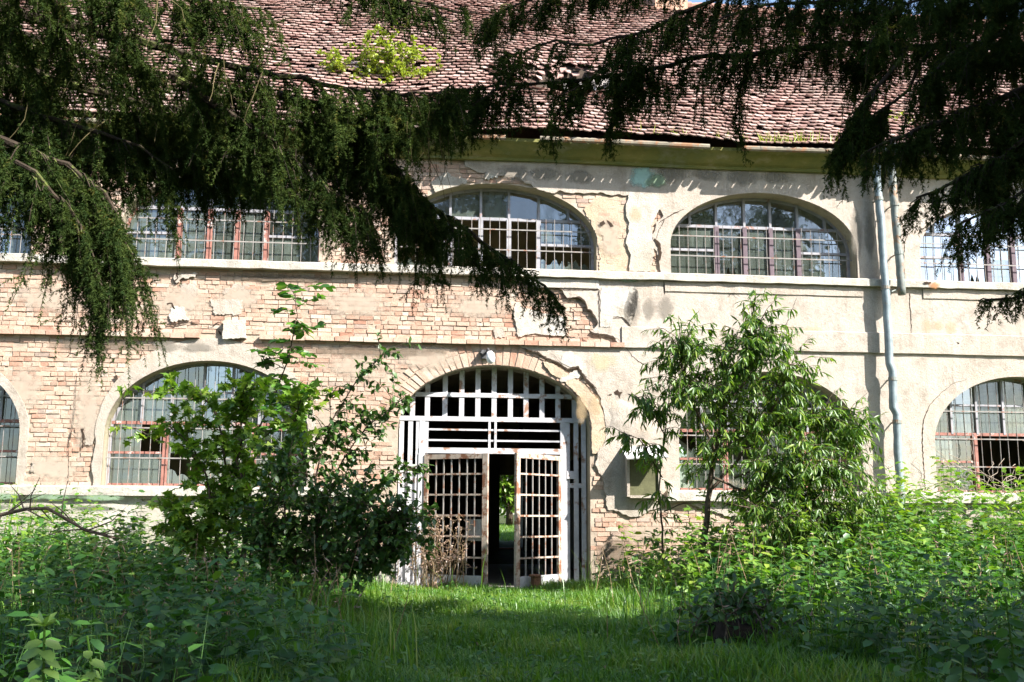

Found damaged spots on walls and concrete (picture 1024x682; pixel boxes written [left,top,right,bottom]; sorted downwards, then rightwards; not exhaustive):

flaking render [395,159,536,194]
water stain [621,279,672,319]
flaking render [0,189,787,578]